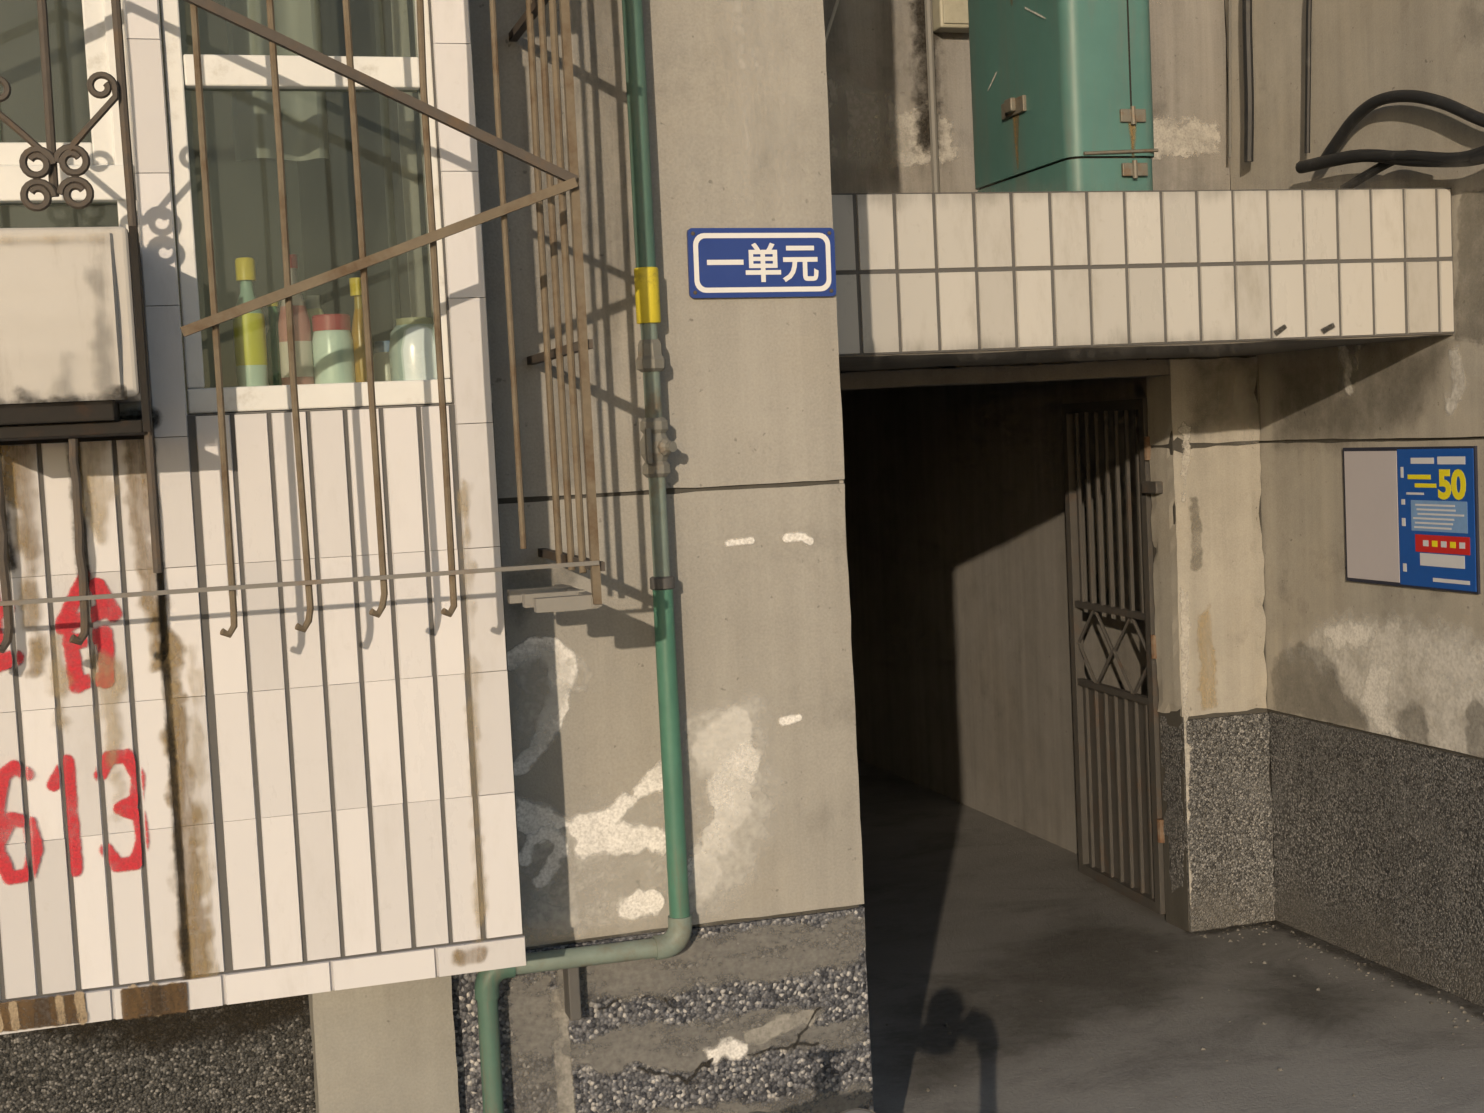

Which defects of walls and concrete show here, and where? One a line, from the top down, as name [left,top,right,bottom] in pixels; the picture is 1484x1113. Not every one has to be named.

corrosion [126,439,210,979]
efflorescence [507,637,579,776]
efflorescence [1300,618,1484,758]
efflorescence [516,762,666,935]
efflorescence [687,702,769,908]